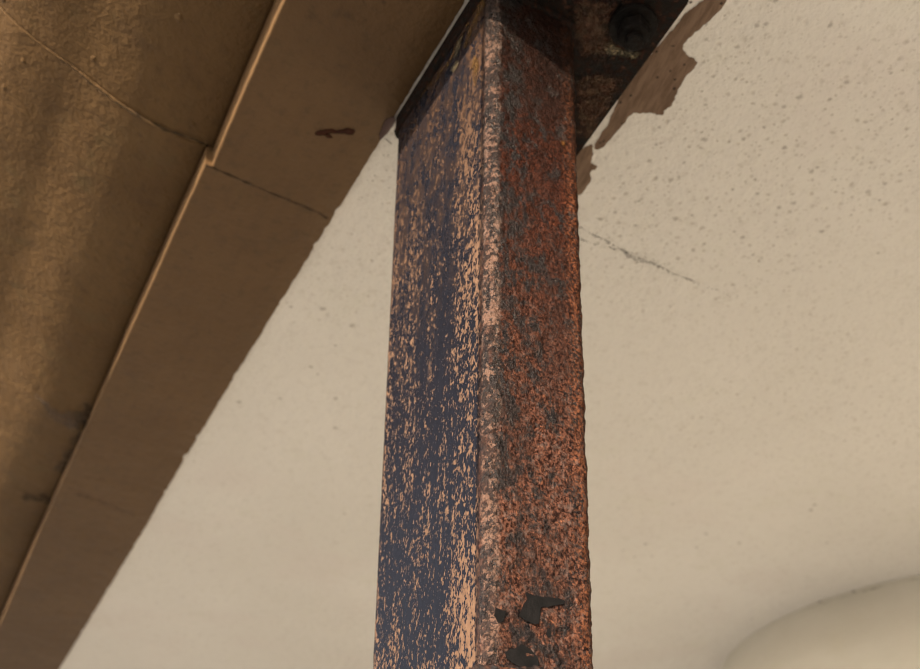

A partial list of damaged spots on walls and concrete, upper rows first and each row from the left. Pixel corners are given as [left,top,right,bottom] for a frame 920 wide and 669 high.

corrosion [379,116,396,140]
crack [578,227,737,298]